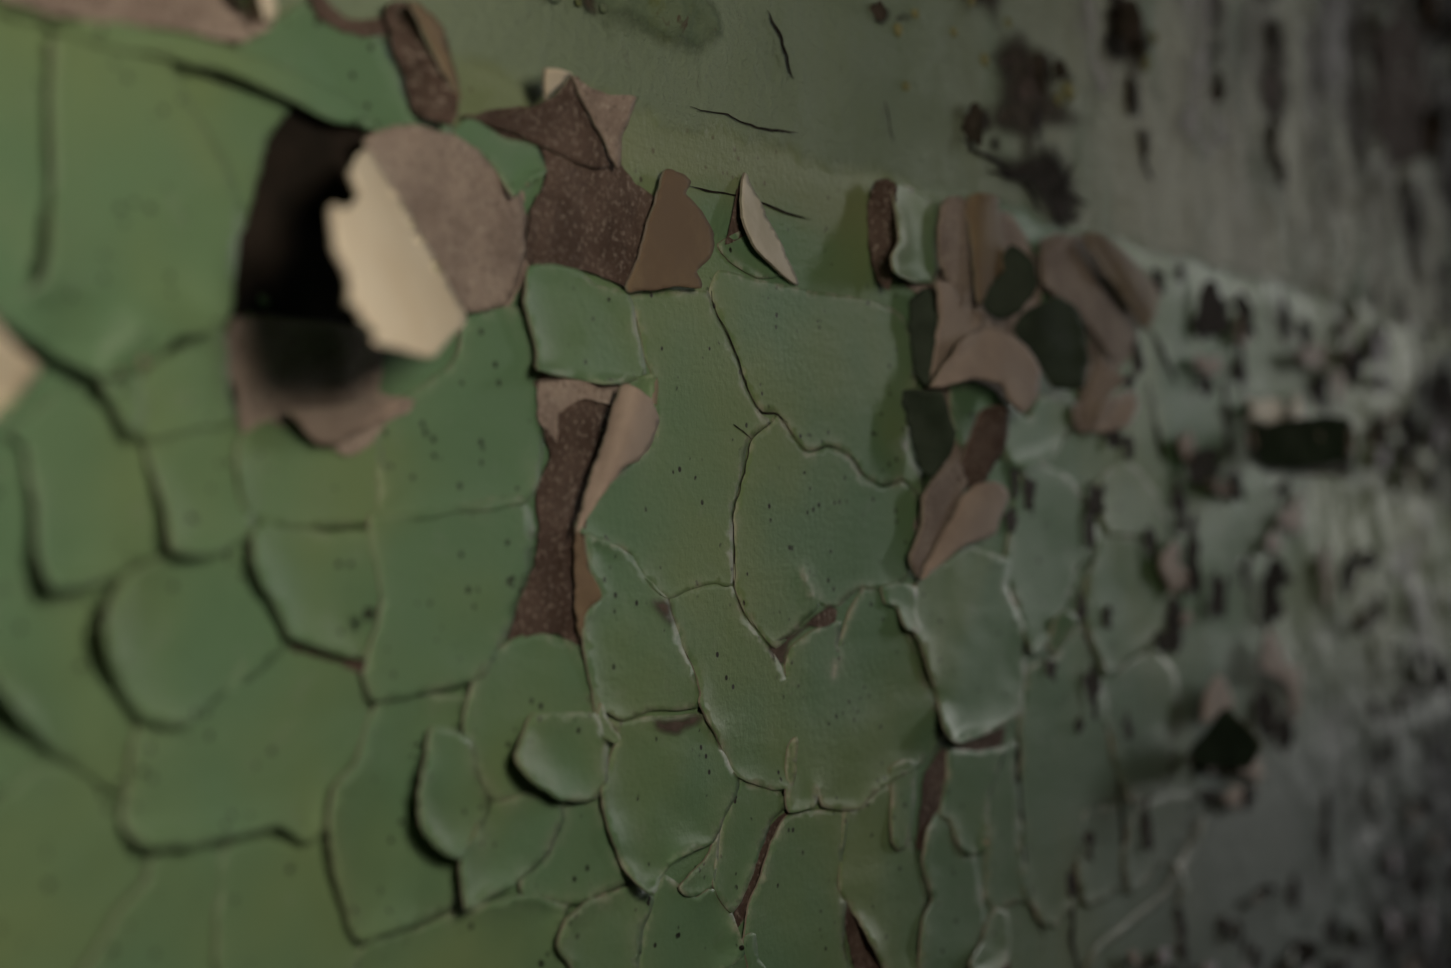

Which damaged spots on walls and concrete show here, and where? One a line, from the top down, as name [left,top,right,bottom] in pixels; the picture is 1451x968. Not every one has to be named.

flaking render [962,0,1075,151]
flaking render [1105,0,1158,156]
flaking render [1207,46,1227,116]
flaking render [1263,66,1287,189]
peeling [0,0,931,968]
peeling [234,173,1202,968]
crack [711,291,919,633]
peeling [1177,280,1388,813]
peeling [1367,362,1451,509]
crack [1016,721,1080,968]
peeling [1127,905,1216,968]